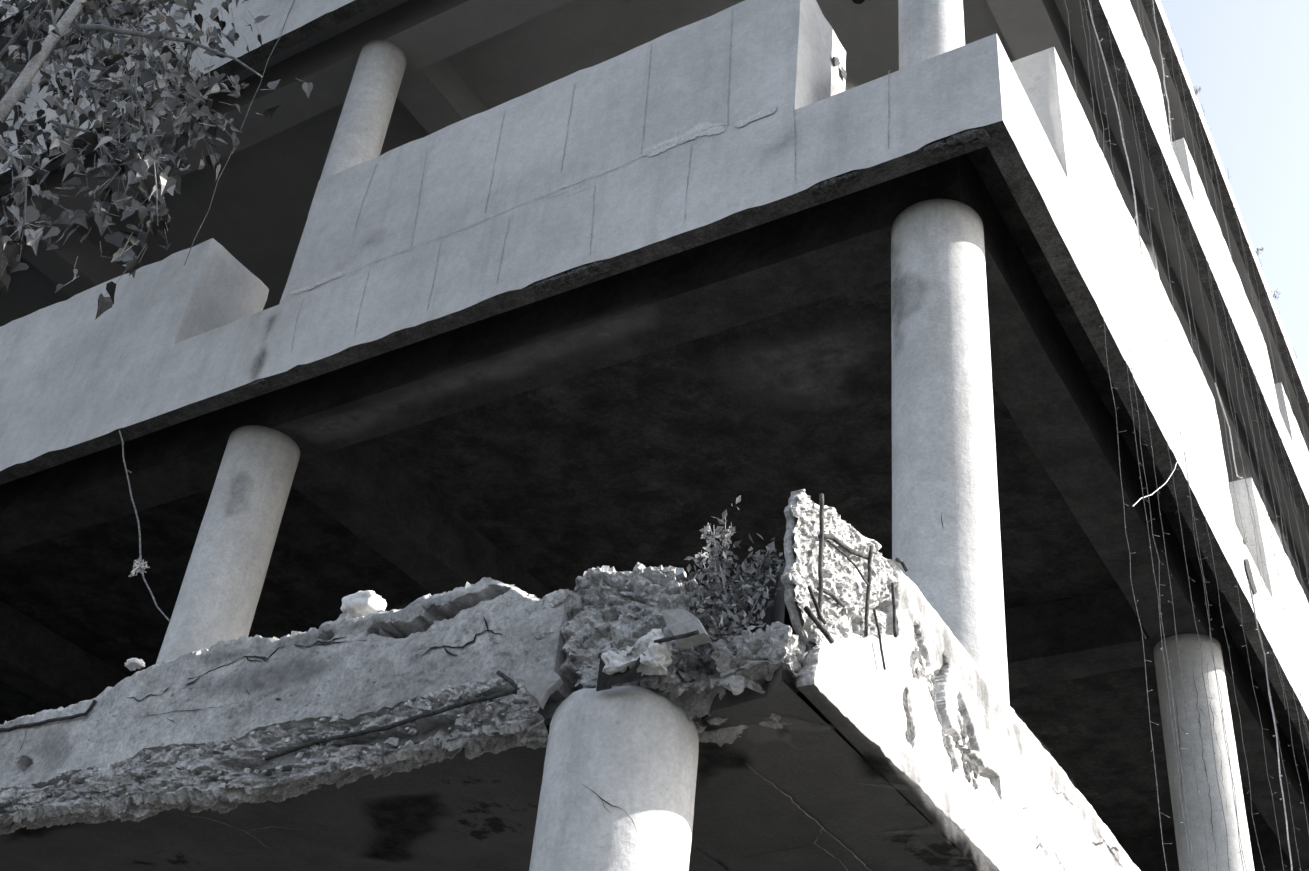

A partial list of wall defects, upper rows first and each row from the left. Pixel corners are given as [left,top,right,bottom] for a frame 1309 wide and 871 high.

peeling [642,105,776,157]
spalling [0,670,564,835]
crack [420,616,502,657]
spalling [653,621,816,747]
spalling [902,632,979,790]